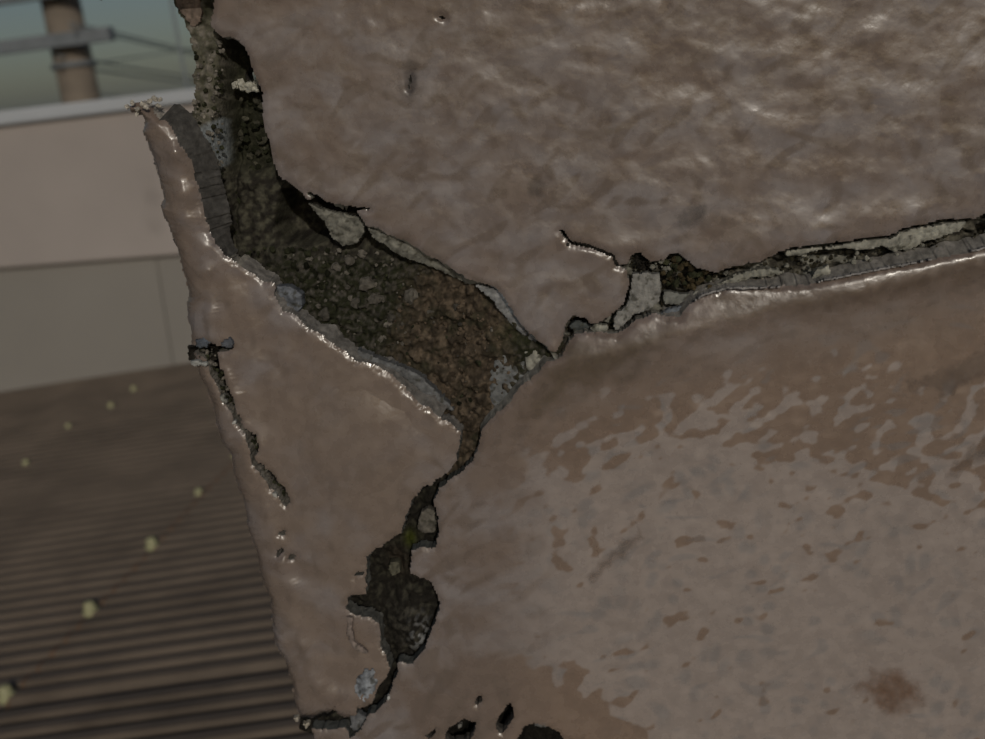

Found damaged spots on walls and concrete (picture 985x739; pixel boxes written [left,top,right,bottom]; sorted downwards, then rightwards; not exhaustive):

crack [564,213,985,335]
crack [187,337,290,500]
flaking render [124,0,571,717]